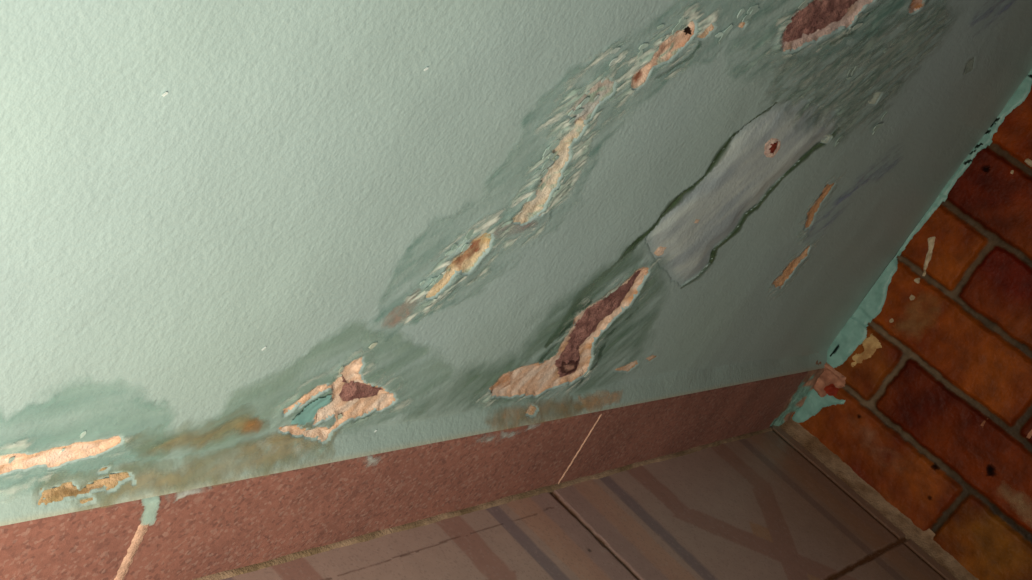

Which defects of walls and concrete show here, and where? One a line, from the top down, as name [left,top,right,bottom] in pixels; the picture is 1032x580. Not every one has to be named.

peeling [777,0,873,54]
peeling [405,4,717,324]
peeling [476,246,666,415]
peeling [278,342,406,453]
peeling [824,384,839,396]
peeling [0,431,121,474]
peeling [38,467,131,505]